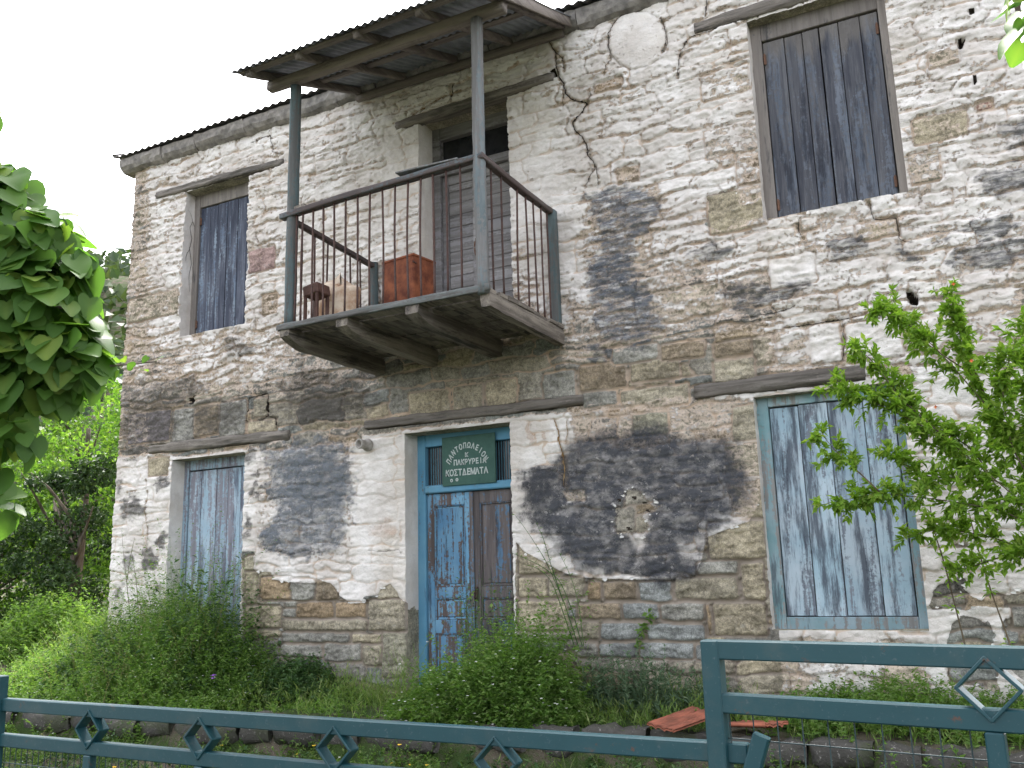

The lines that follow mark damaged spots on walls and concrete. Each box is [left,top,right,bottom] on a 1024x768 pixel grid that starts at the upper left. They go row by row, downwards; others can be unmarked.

crack [549,17,620,184]
damp [583,188,662,363]
damp [241,434,355,558]
damp [522,466,557,522]
spalling [241,551,408,698]
spalling [515,498,782,712]
damp [632,560,697,585]